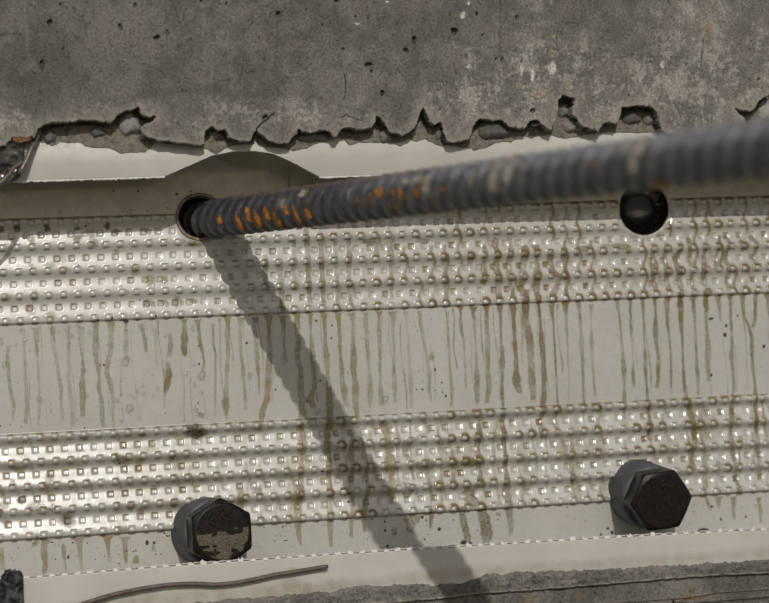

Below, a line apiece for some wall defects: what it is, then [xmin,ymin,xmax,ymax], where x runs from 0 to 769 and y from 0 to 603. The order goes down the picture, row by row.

spalling [24,95,662,154]
spalling [737,95,769,123]
rust [235,204,312,243]
rust [306,263,326,303]
rust [650,237,718,287]
rust [458,241,569,420]
rust [256,363,272,429]
rust [321,313,359,486]
rust [629,286,769,448]
rust [188,424,207,441]
rust [500,418,510,499]
rust [458,489,493,545]